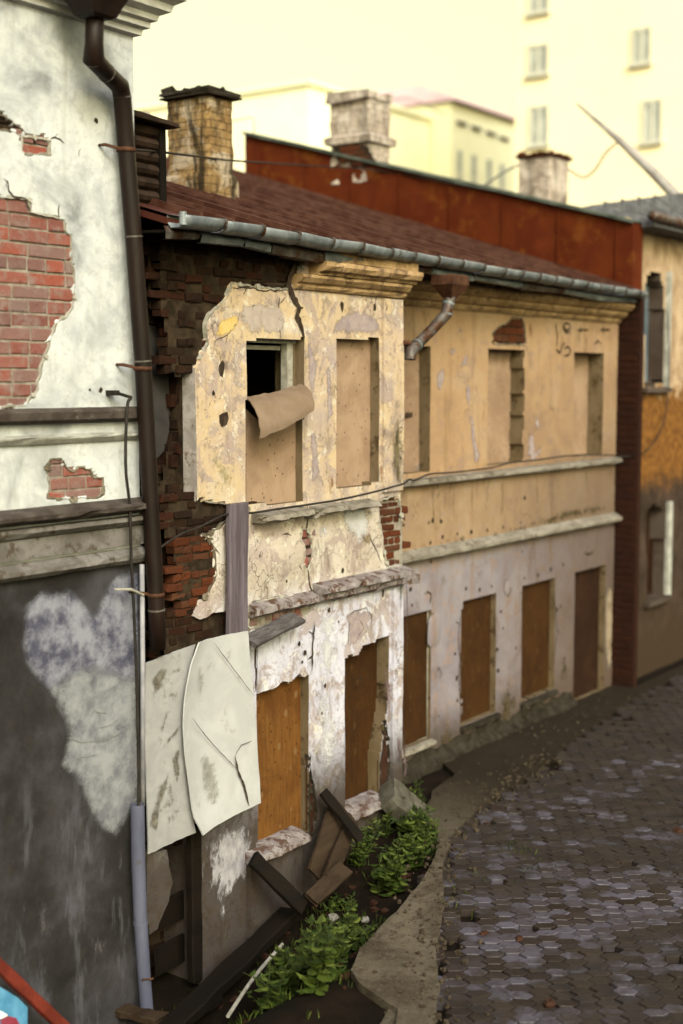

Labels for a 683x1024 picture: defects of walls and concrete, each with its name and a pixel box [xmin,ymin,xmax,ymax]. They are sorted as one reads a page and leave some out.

flaking render [0,112,52,156]
flaking render [0,195,77,409]
crack [215,261,305,341]
flaking render [488,317,526,351]
peeling [25,224,304,849]
flaking render [301,526,327,571]
flaking render [344,494,411,568]
flaking render [248,580,369,669]
crack [192,718,251,805]
spalling [148,928,164,978]